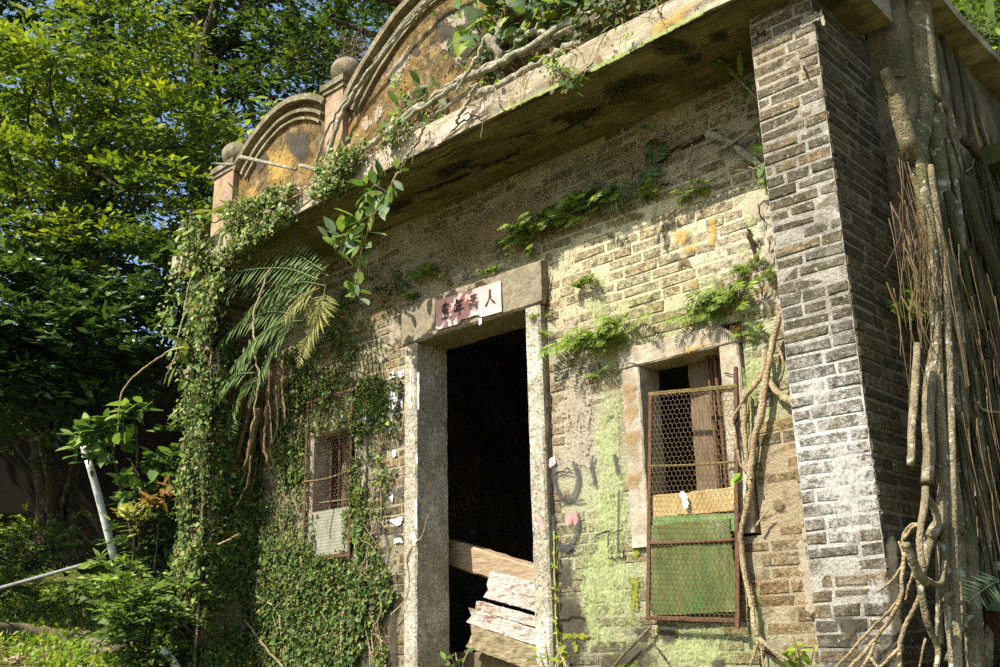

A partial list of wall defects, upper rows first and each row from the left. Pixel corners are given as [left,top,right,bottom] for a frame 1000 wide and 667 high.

leakage [429,2,476,66]
leakage [504,70,570,111]
leakage [432,100,491,145]
leakage [257,130,312,186]
leakage [430,193,561,258]
leakage [360,283,400,320]
leakage [595,491,625,567]
leakage [556,562,586,667]
leakage [599,624,676,667]